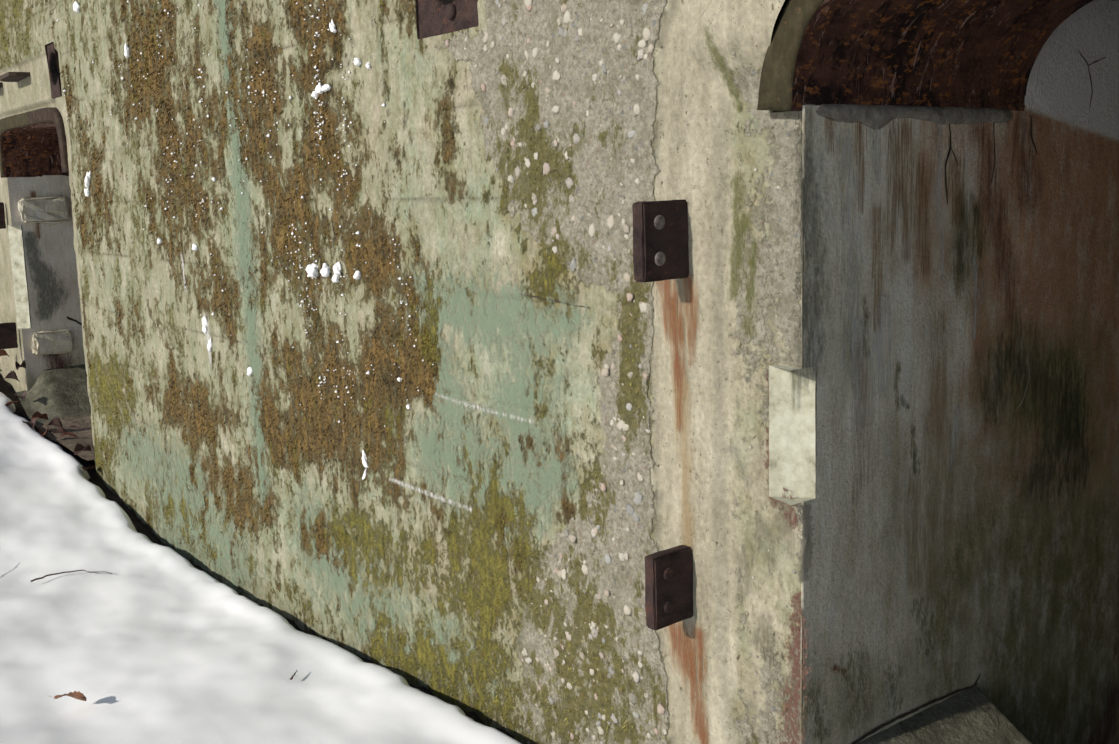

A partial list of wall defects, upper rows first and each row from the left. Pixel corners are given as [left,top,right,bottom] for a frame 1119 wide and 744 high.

crack [1078,50,1106,110]
water stain [214,0,270,504]
rust [656,275,699,433]
water stain [393,479,472,511]
rust [668,621,708,744]